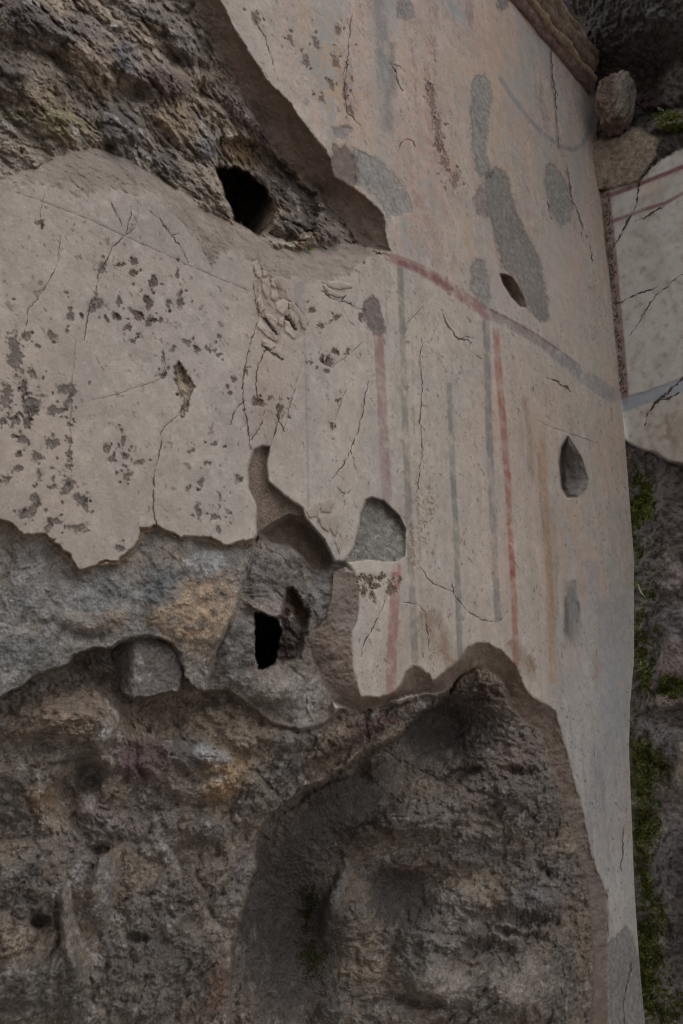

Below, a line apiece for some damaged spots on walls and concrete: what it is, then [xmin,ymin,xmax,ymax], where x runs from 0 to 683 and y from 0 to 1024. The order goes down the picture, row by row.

spalling [0,0,357,251]
crack [342,16,359,124]
crack [69,202,188,468]
crack [153,400,190,526]
crack [230,260,307,450]
crack [306,342,369,554]
crack [323,281,354,307]
crack [617,274,683,334]
spalling [0,256,449,1024]
crack [420,567,508,622]